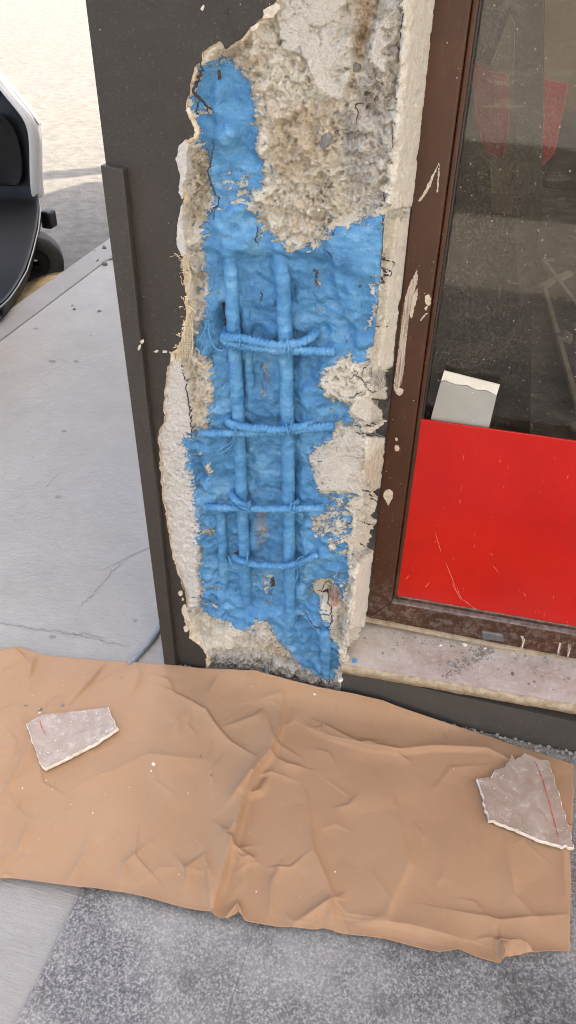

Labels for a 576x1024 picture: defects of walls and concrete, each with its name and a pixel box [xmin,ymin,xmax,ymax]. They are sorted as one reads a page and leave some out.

spalling [158,0,405,691]
crack [297,581,333,629]